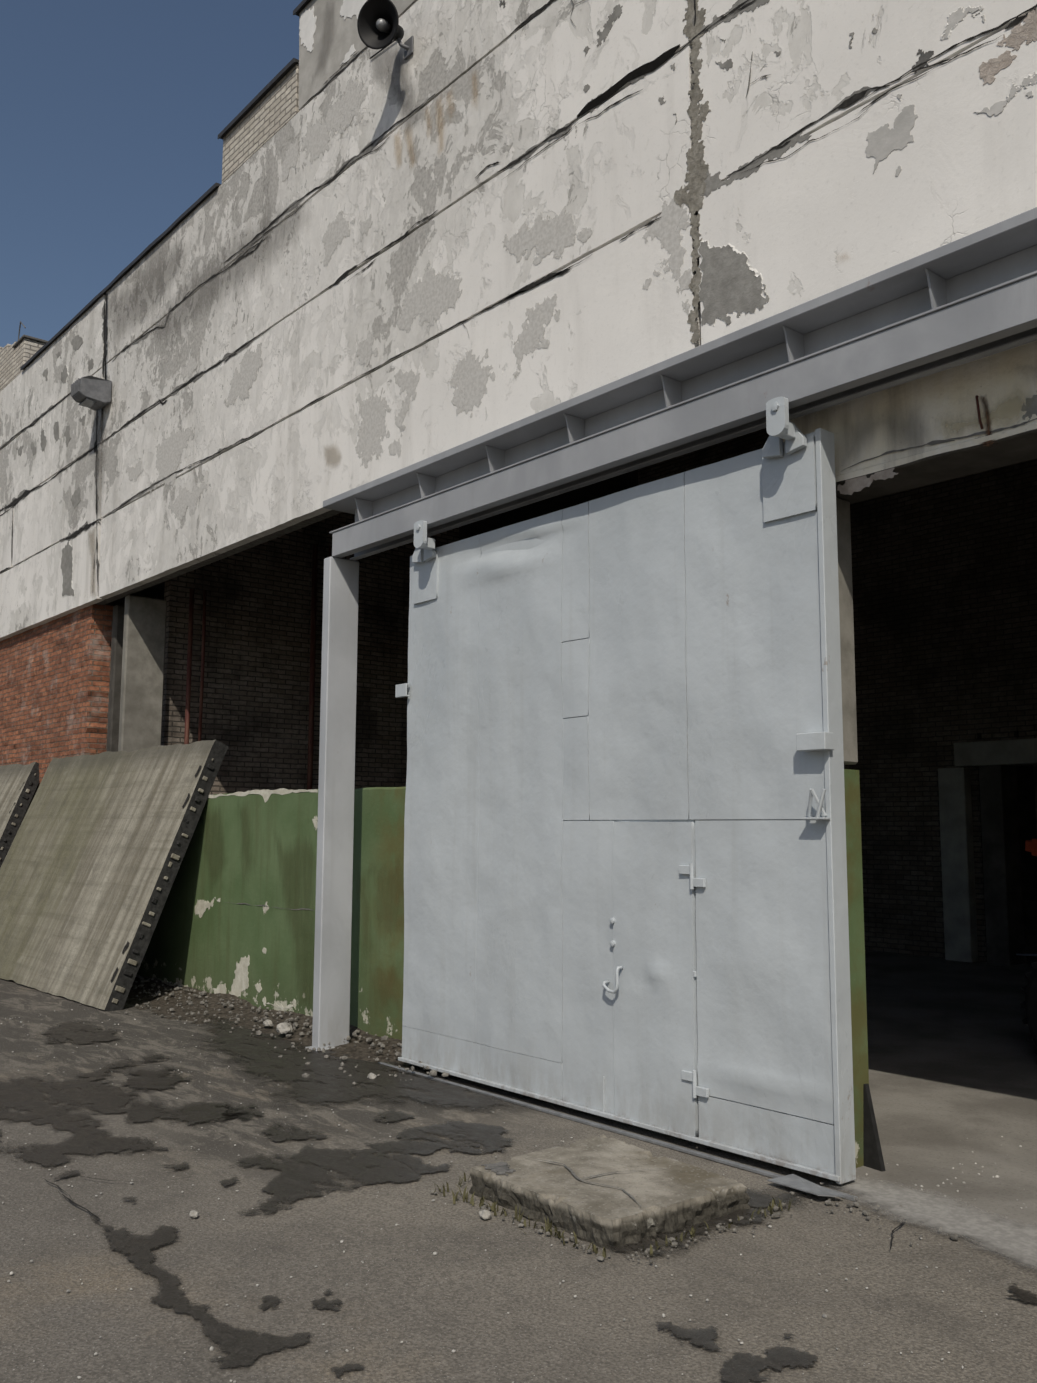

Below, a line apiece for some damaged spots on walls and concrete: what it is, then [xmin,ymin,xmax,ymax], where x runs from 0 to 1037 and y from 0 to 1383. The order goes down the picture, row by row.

crack [302,47,368,107]
crack [475,0,755,180]
crack [726,4,1037,177]
spalling [979,8,1037,85]
peeling [643,0,812,344]
peeling [865,94,918,177]
crack [102,94,437,374]
crack [0,255,591,593]
peeling [450,348,495,418]
rust [982,397,994,445]
peeling [195,898,221,918]
peeling [213,948,296,1011]